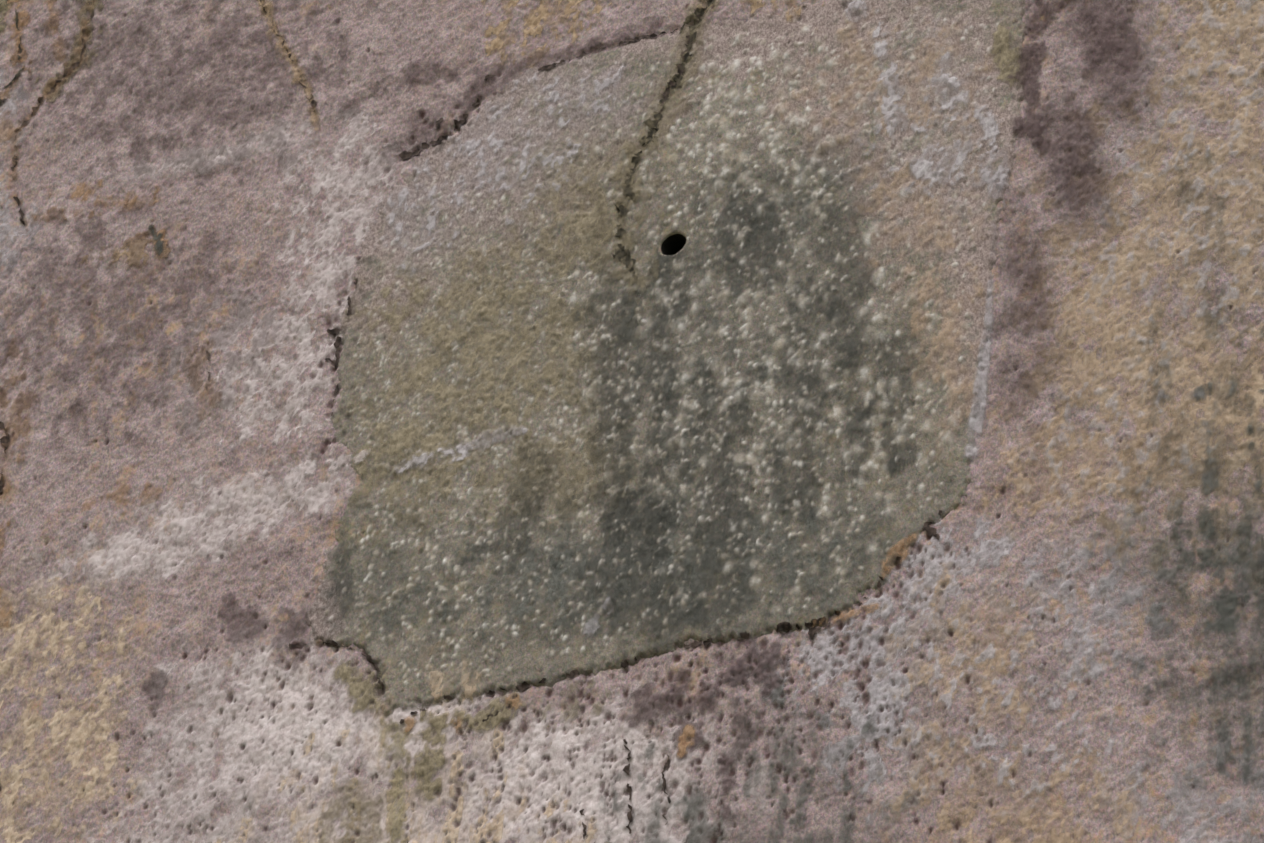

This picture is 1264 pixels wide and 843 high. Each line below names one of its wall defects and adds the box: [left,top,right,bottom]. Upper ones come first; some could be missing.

crack [0,10,93,225]
crack [399,75,496,161]
crack [538,0,715,280]
leakage [136,109,458,448]
leakage [731,0,1264,843]
leakage [0,456,350,843]
leakage [178,637,742,843]
peeling [404,692,524,800]
spalling [625,633,788,759]
crack [684,556,902,648]
peeling [813,603,995,707]
peeling [906,679,1020,785]